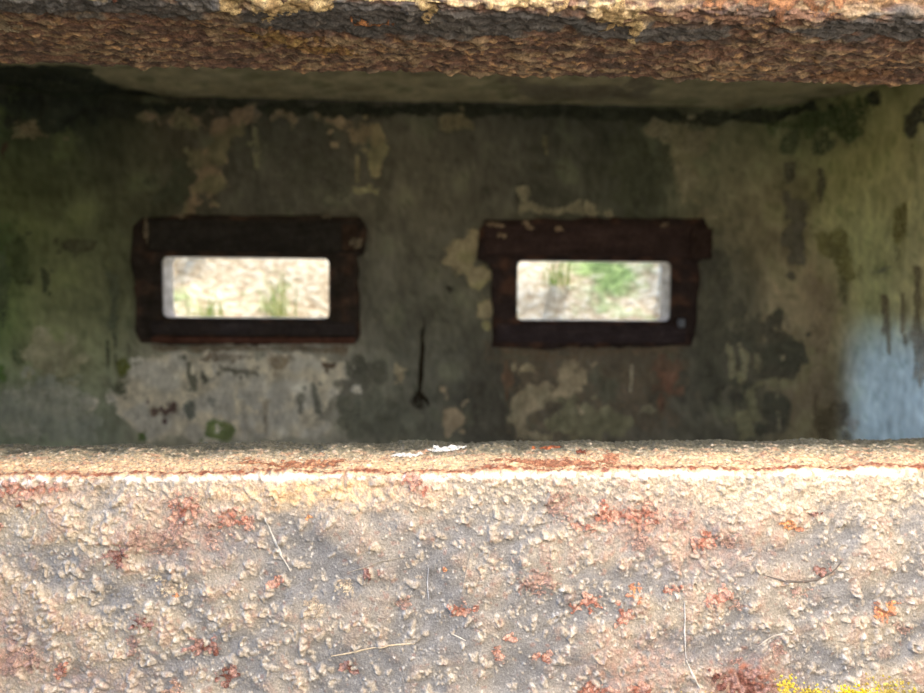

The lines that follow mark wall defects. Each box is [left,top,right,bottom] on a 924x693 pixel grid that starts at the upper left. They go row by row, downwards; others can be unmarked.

damp [0,63,837,138]
peeling [136,99,298,214]
peeling [313,112,390,195]
damp [880,264,924,388]
peeling [79,344,408,445]
peeling [506,354,597,442]
rust [708,657,777,693]